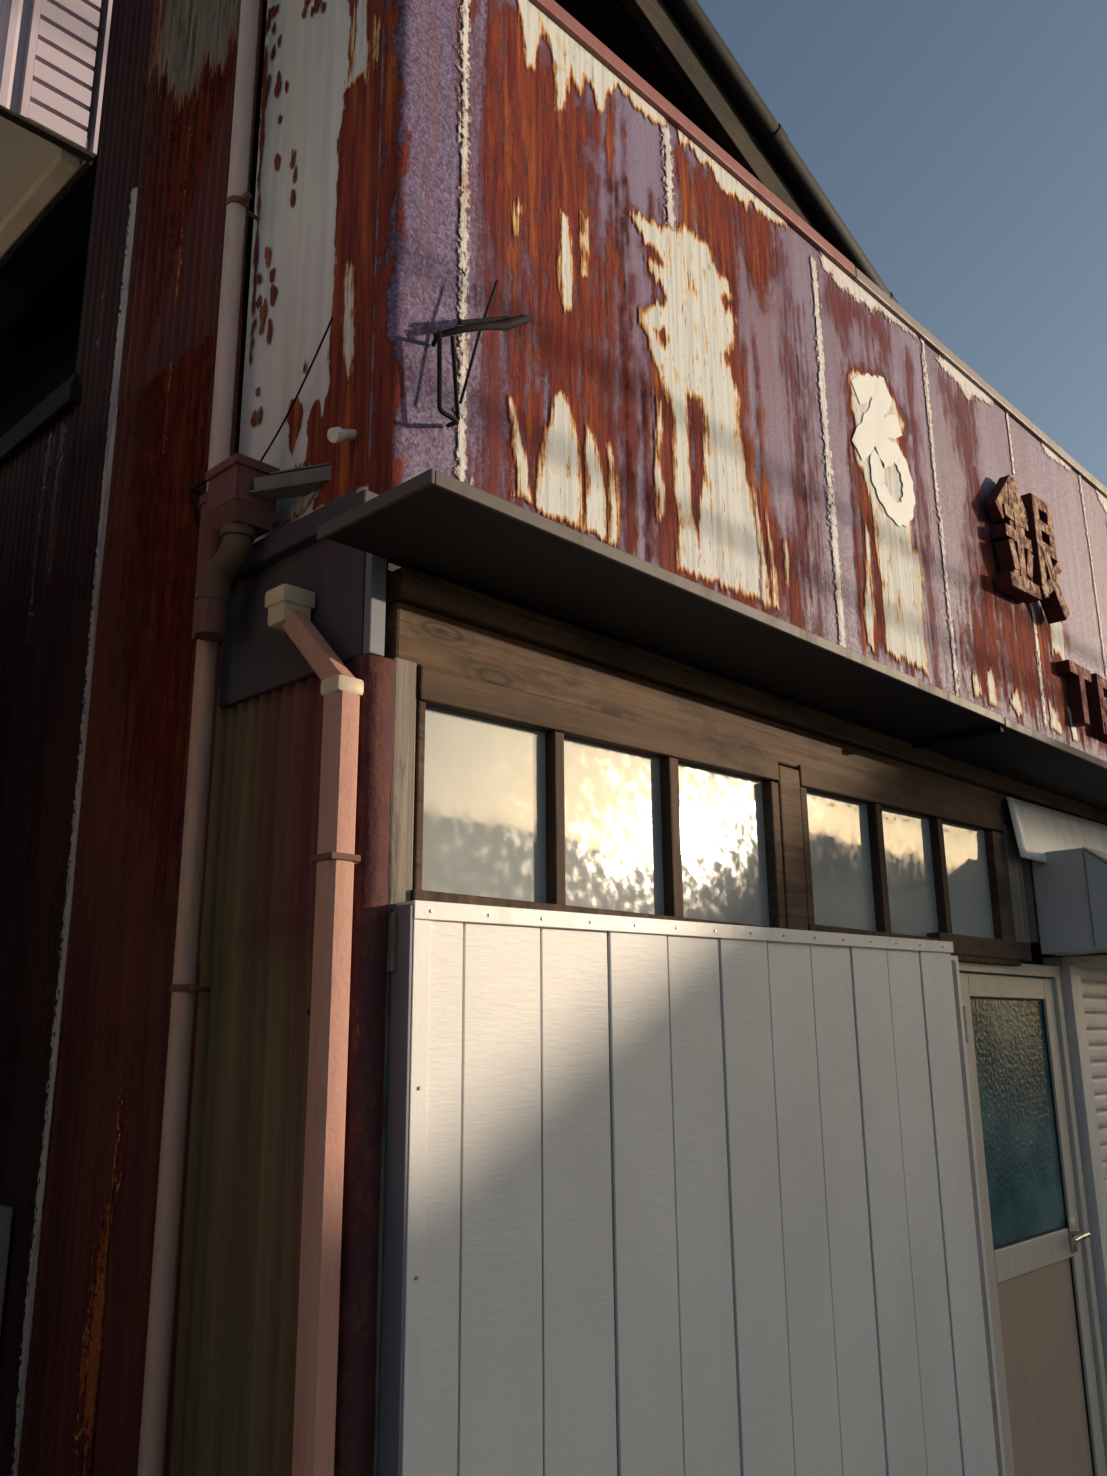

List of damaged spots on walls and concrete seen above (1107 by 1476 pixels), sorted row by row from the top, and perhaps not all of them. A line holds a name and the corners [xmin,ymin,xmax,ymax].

corrosion [250,387,262,427]
corrosion [249,4,297,366]
corrosion [287,0,412,511]
corrosion [456,0,824,638]
peeling [508,0,790,611]
peeling [810,251,1023,718]
corrosion [818,269,1107,754]
peeling [1030,603,1080,744]
corrosion [72,1070,127,1476]